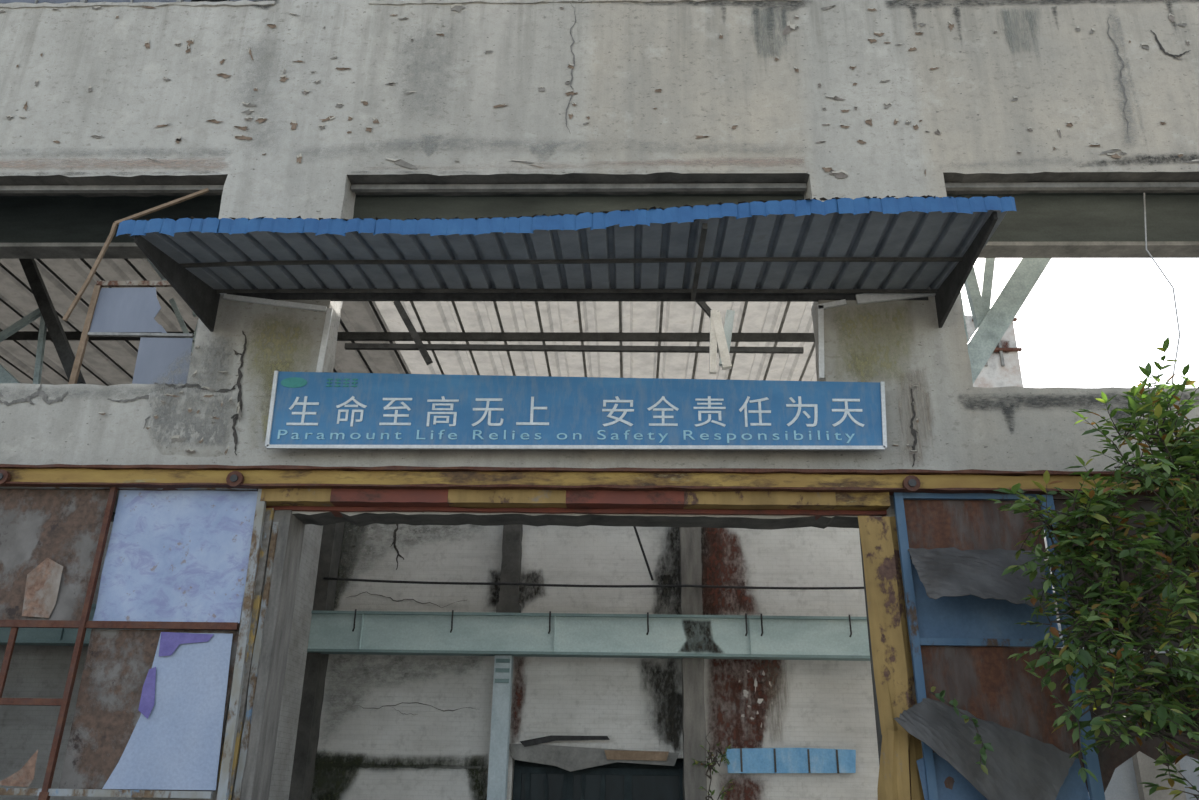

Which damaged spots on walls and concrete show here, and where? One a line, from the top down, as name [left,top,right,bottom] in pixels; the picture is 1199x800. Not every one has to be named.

crack [1150,30,1191,58]
flaking render [279,60,321,95]
flaking render [206,87,267,140]
flaking render [318,100,379,133]
crack [107,331,247,455]
crack [346,524,466,608]
mould [519,571,545,605]
mould [655,527,681,615]
corrosion [681,527,782,753]
mould [642,659,682,750]
mould [311,752,488,800]
corrosion [722,777,763,800]